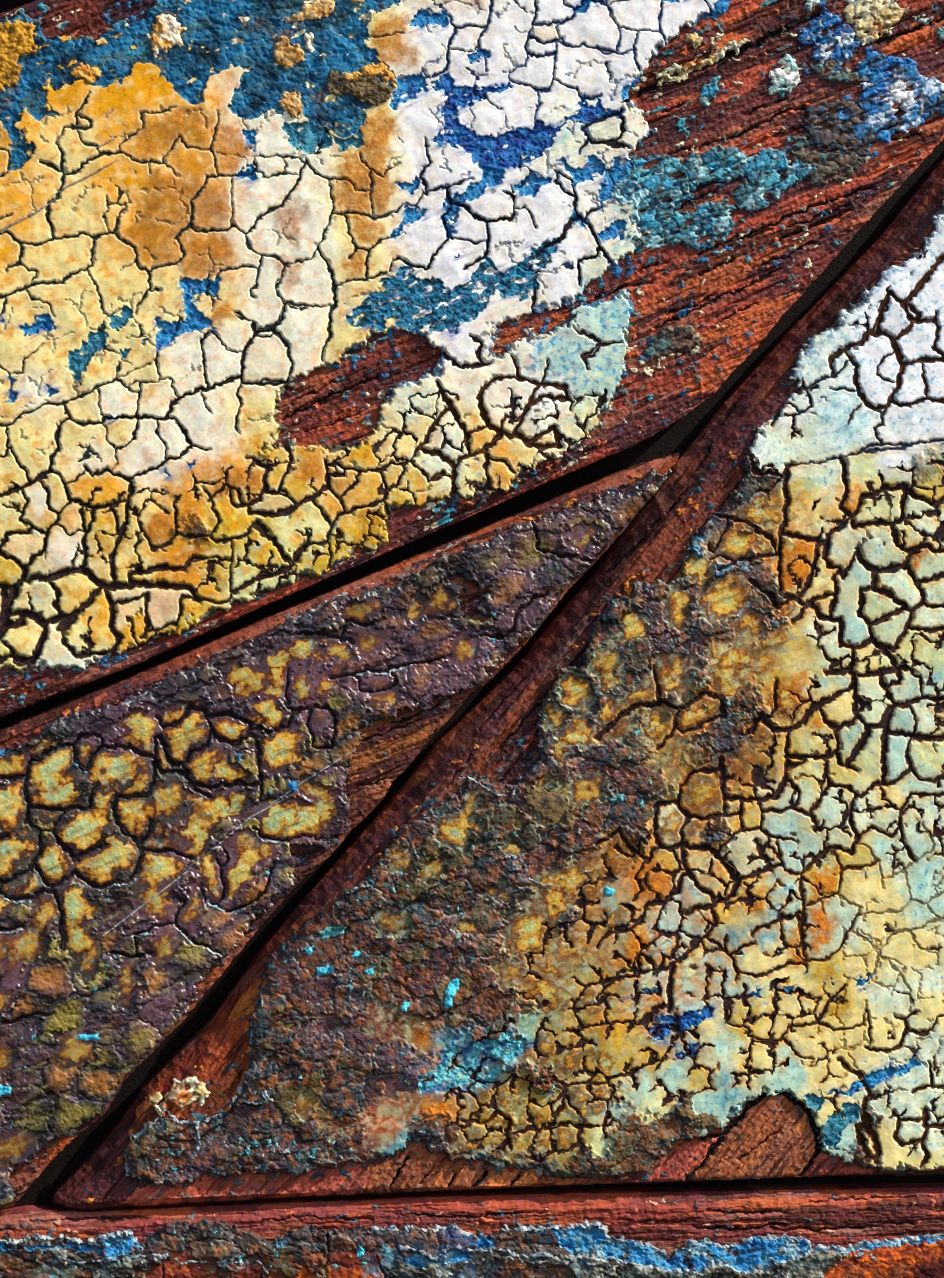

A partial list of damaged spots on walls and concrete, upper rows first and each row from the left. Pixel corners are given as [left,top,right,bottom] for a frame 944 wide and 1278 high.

peeling [685,0,732,52]
crack [891,132,922,141]
crack [655,187,872,328]
crack [0,0,823,666]
peeling [259,236,630,458]
crack [0,618,449,958]
crack [2,1012,51,1023]
peeling [119,926,586,1206]
peeling [626,1055,921,1182]
crack [0,1216,135,1231]
peeling [0,1236,299,1277]
peeling [371,1219,944,1272]